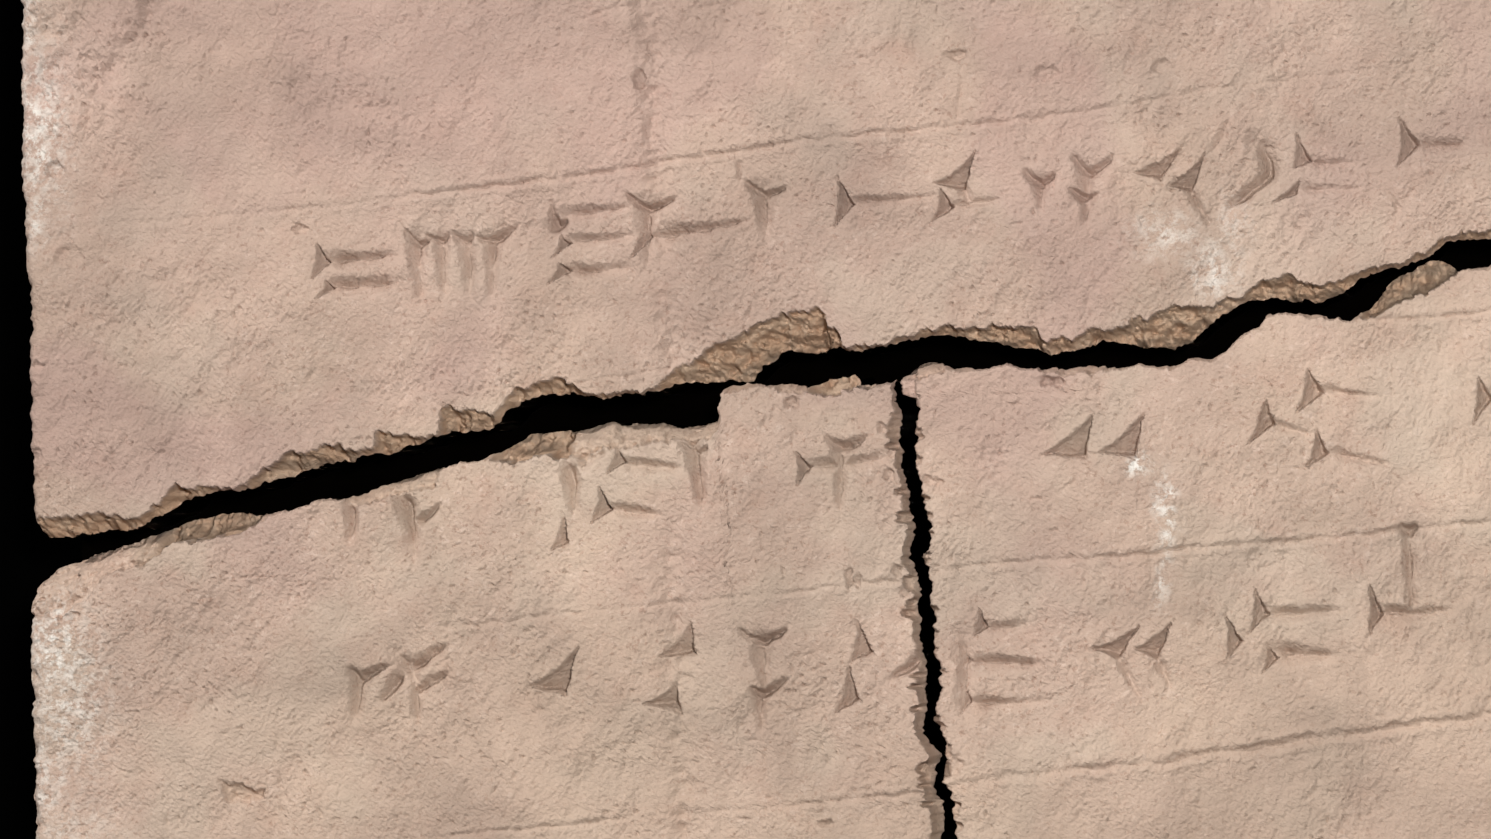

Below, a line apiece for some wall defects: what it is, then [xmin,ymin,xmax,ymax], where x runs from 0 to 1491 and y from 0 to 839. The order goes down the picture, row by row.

crack [81,245,1491,839]